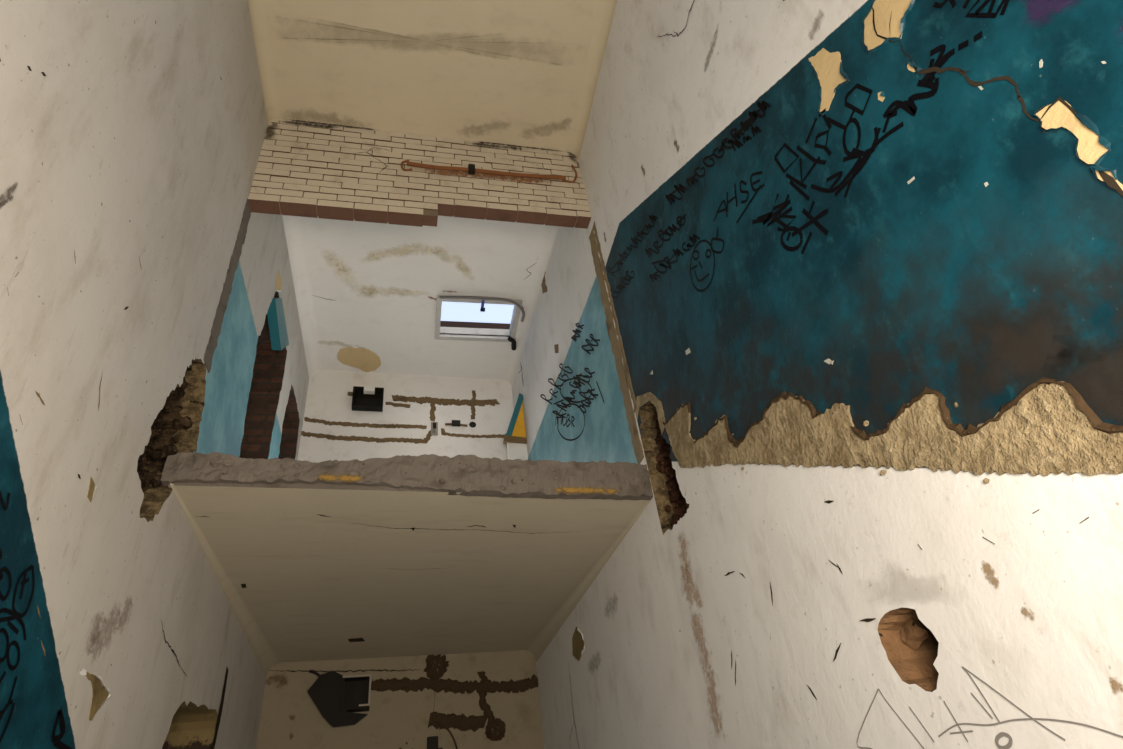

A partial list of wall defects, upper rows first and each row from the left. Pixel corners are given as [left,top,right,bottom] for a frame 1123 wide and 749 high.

peeling [862,0,915,54]
peeling [808,48,850,115]
crack [871,5,1101,137]
peeling [1032,101,1123,191]
crack [1097,165,1123,196]
spalling [137,198,1123,535]
peeling [79,668,111,721]
spalling [424,654,449,679]
spalling [878,607,939,692]